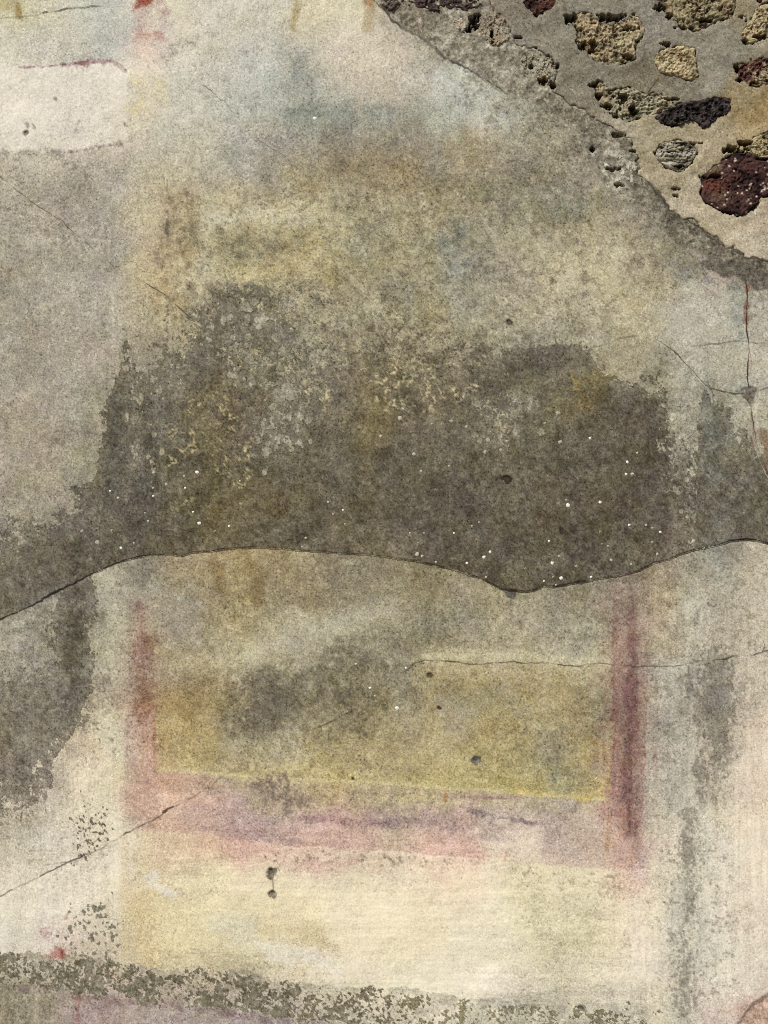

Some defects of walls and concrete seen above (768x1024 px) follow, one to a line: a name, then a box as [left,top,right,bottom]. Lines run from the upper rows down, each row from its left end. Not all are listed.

flaking render [374,0,768,290]
crack [660,281,768,477]
crack [0,546,254,620]
water stain [0,237,768,826]
crack [402,538,768,592]
water stain [69,804,115,866]
crack [0,798,189,896]
flaking render [738,994,768,1024]